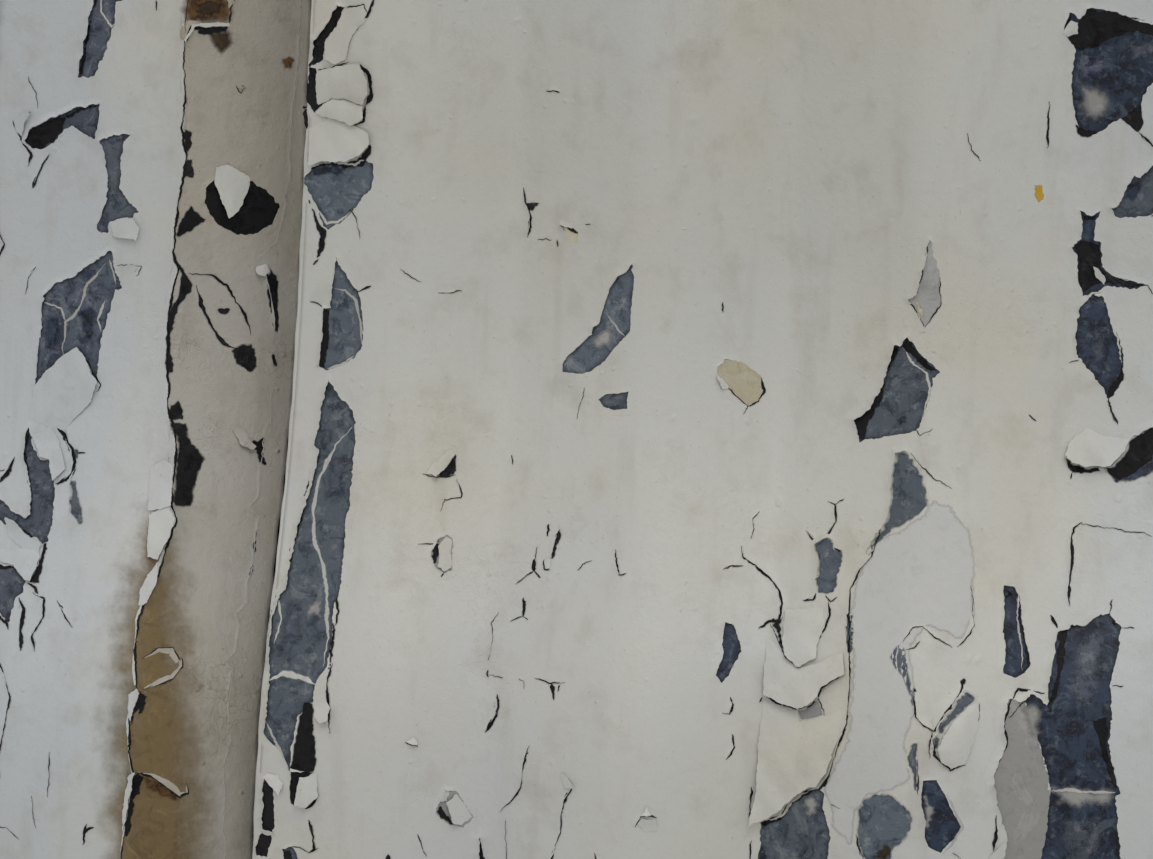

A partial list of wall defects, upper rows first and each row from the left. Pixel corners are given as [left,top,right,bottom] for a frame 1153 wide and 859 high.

peeling [0,0,146,630]
peeling [197,163,287,242]
peeling [253,0,381,859]
peeling [553,252,644,416]
peeling [710,352,770,413]
peeling [803,233,950,604]
peeling [1055,0,1153,495]
crack [498,744,529,859]
crack [541,772,572,859]
crack [720,512,881,791]
peeling [749,610,982,859]
peeling [983,577,1134,859]